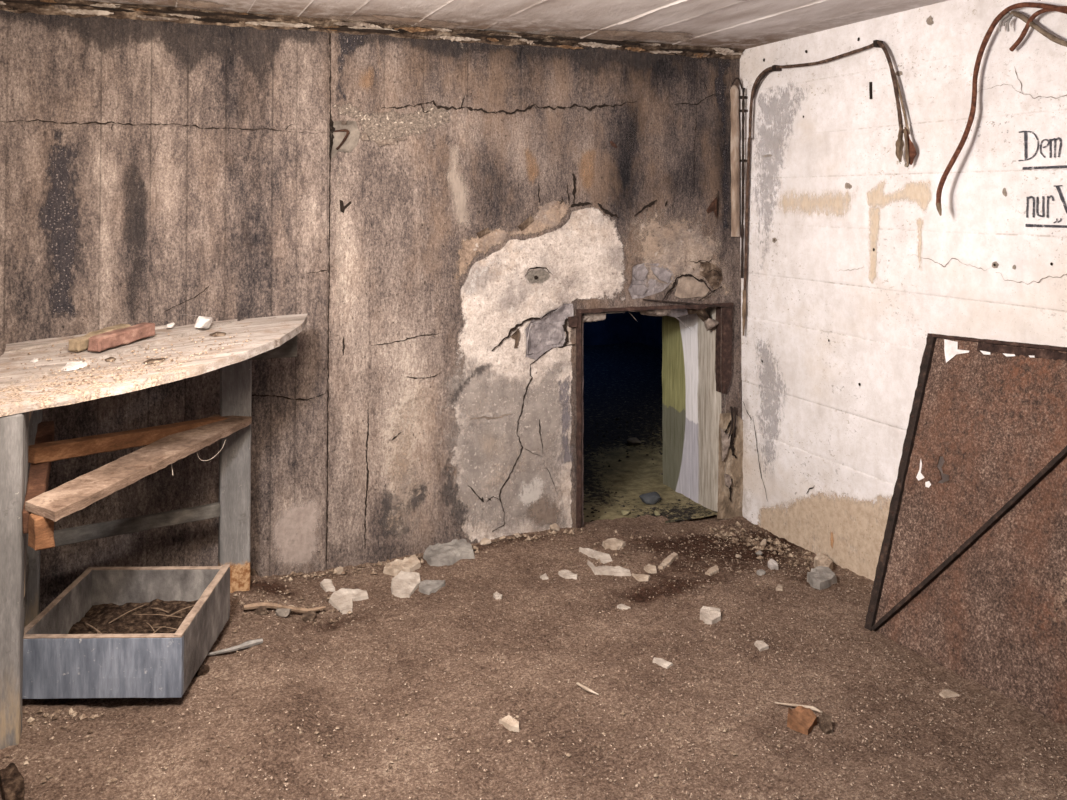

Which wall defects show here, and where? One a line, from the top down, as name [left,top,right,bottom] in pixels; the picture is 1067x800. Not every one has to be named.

crack [382,96,636,115]
crack [978,70,1067,99]
damp [782,193,850,215]
damp [867,182,931,283]
flaking render [440,192,730,543]
crack [469,344,575,532]
damp [758,492,892,581]